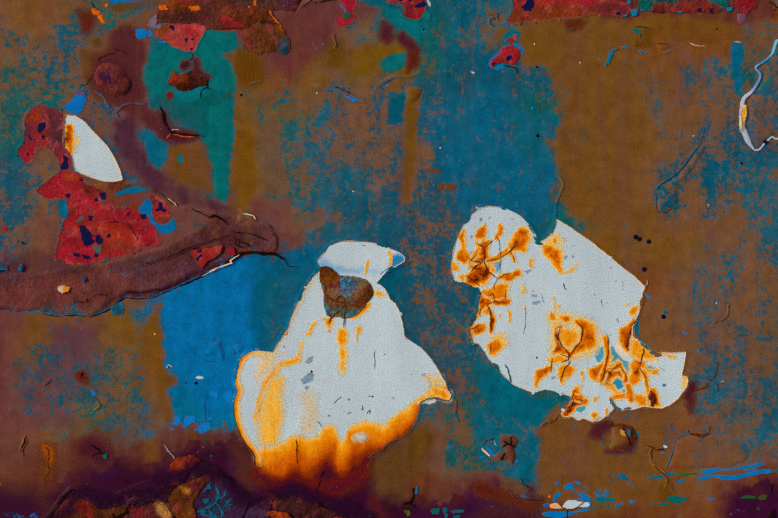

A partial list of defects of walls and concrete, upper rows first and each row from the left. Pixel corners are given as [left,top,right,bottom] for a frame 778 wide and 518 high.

peeling [135,14,207,54]
peeling [383,0,431,33]
peeling [15,90,175,267]
crack [47,492,71,518]
rust [75,436,114,471]
rust [0,461,255,518]
peeling [168,236,455,476]
rust [234,273,452,518]
rust [452,223,578,357]
peeling [447,202,700,427]
spalling [542,474,635,518]
rust [533,296,676,440]